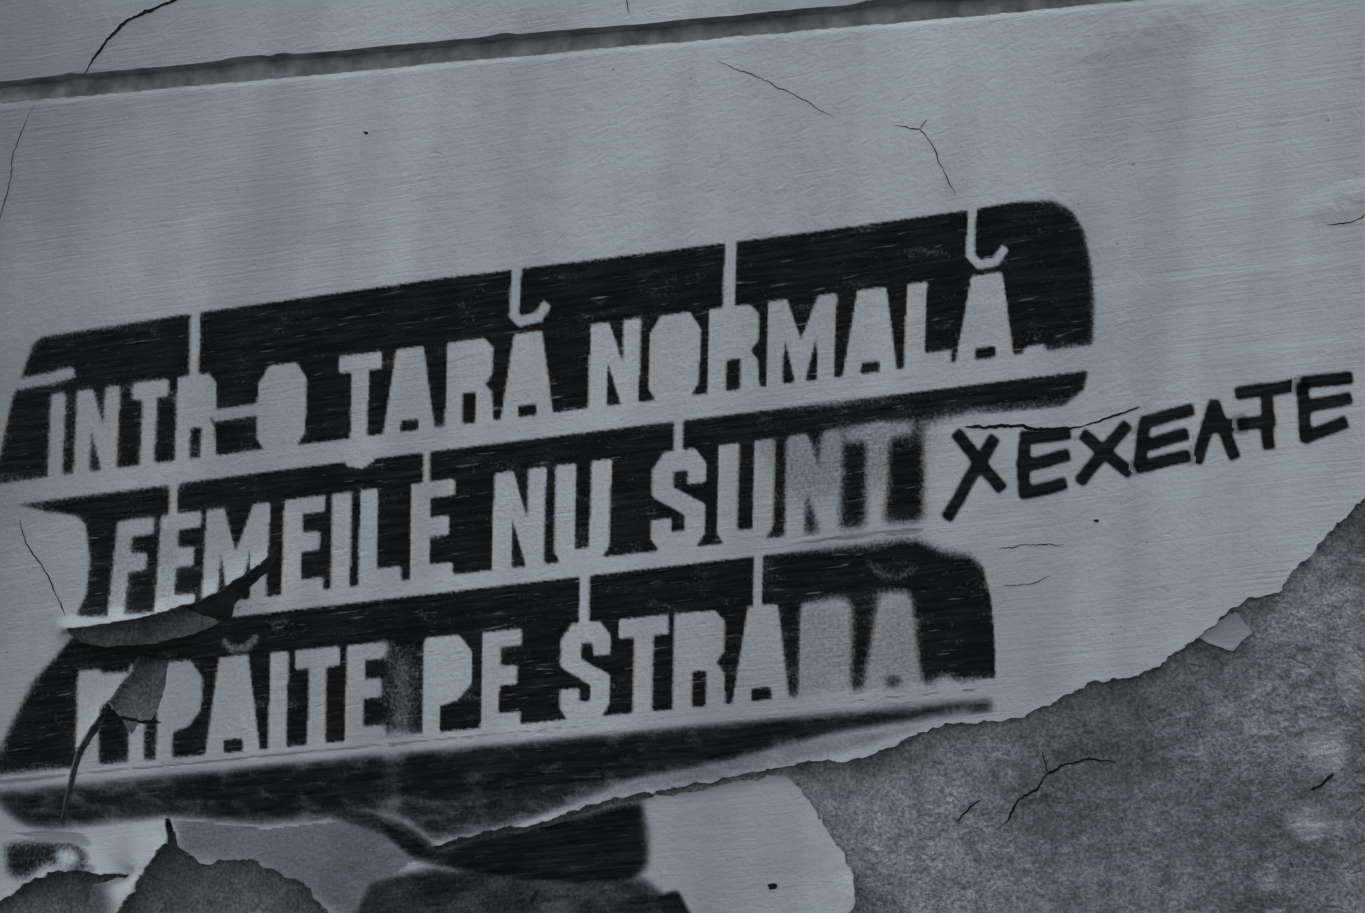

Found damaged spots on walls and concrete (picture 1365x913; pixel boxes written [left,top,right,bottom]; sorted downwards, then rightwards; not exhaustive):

crack [82,0,177,76]
crack [0,104,35,218]
spalling [0,499,1365,913]